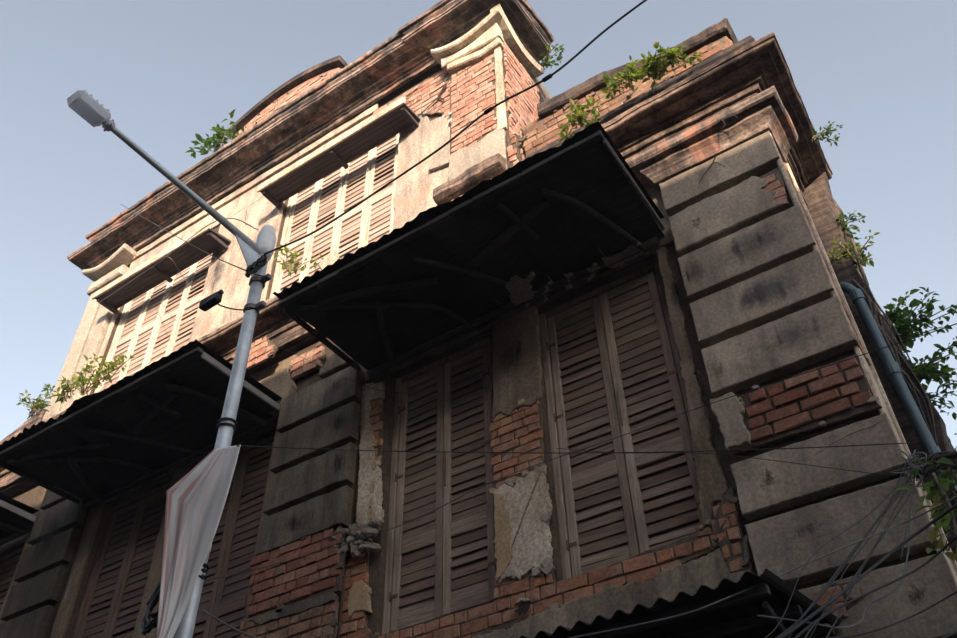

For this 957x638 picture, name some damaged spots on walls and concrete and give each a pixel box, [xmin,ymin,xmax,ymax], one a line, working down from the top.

crack [698,115,739,188]
peeling [506,272,553,307]
flaking render [737,153,882,449]
flaking render [237,381,749,638]
flaking render [813,581,862,624]